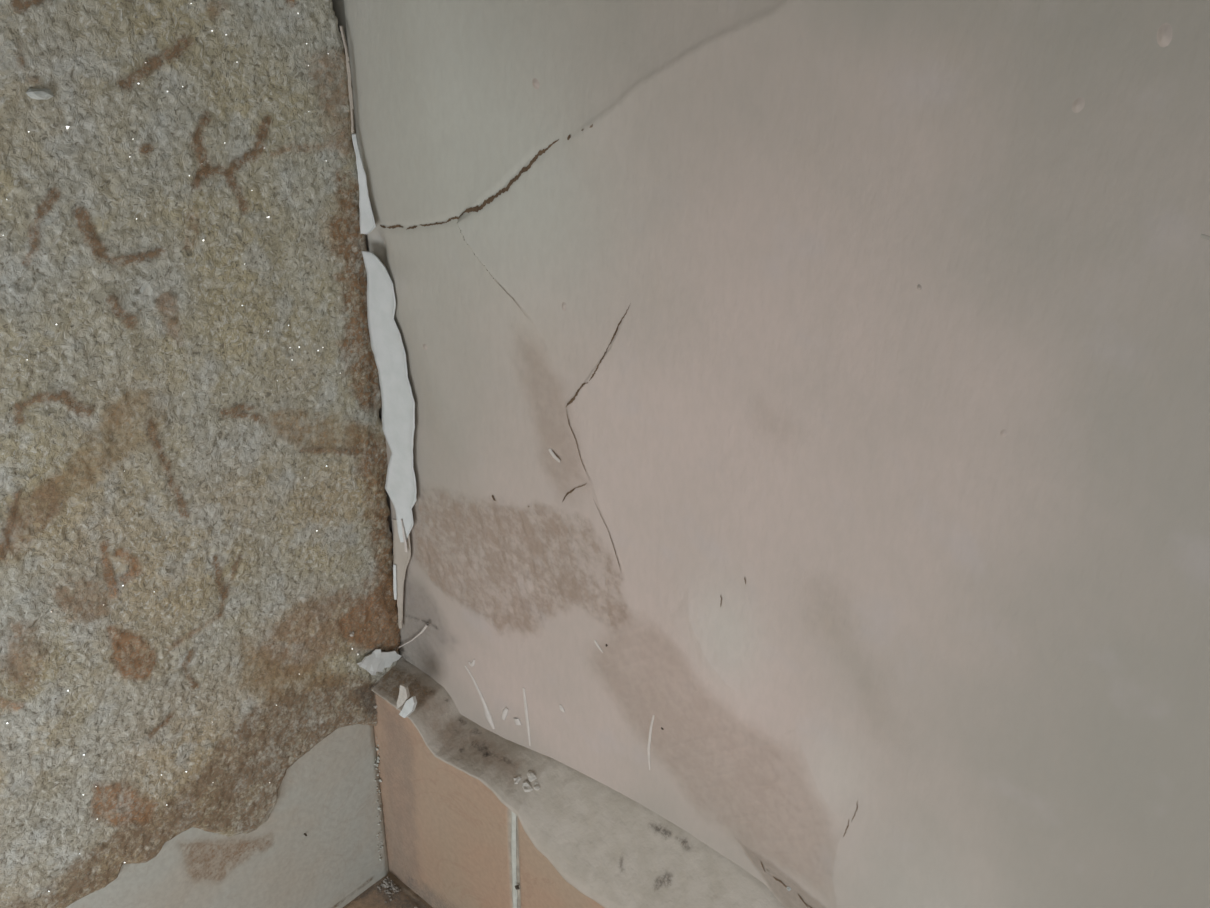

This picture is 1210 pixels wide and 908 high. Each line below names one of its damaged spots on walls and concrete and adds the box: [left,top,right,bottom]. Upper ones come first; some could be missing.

peeling [340,26,376,234]
crack [380,124,593,230]
peeling [362,251,417,629]
crack [552,305,630,571]